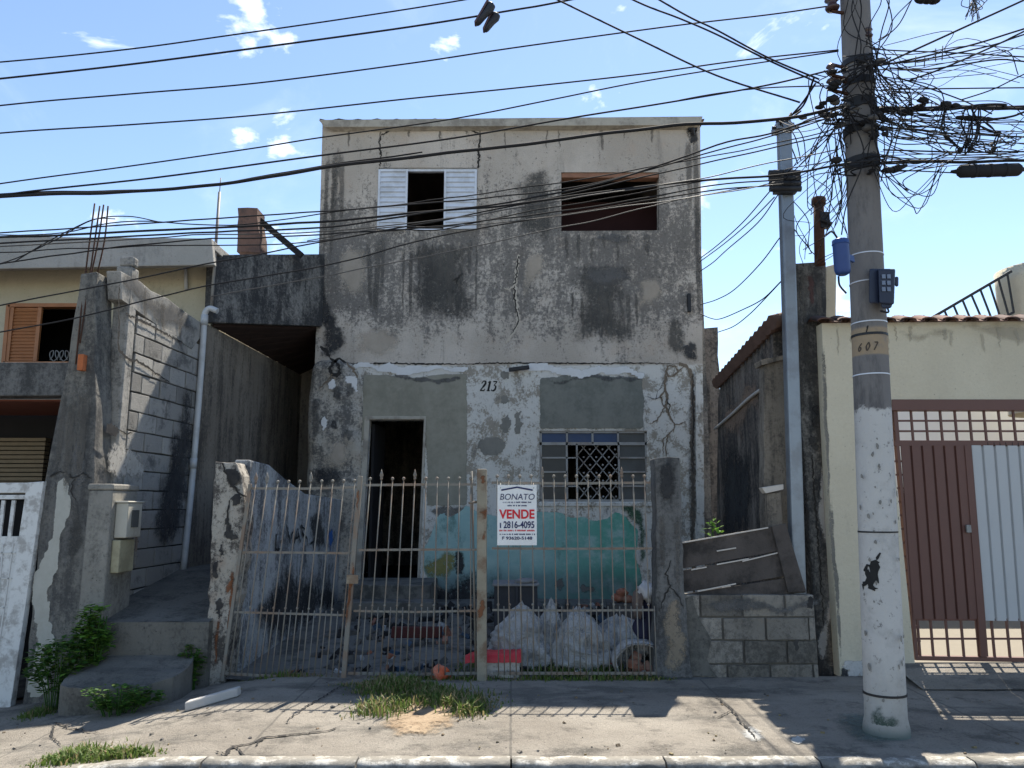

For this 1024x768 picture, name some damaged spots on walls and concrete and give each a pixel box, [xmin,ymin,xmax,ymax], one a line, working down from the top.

leakage [322,288,345,355]
leakage [367,241,385,306]
leakage [402,244,478,316]
crack [319,254,685,457]
leakage [565,234,638,340]
spalling [478,395,523,455]
leakage [155,391,192,544]
spalling [225,469,242,506]
peeling [27,478,71,697]
spalling [211,518,238,619]
crack [659,560,684,611]